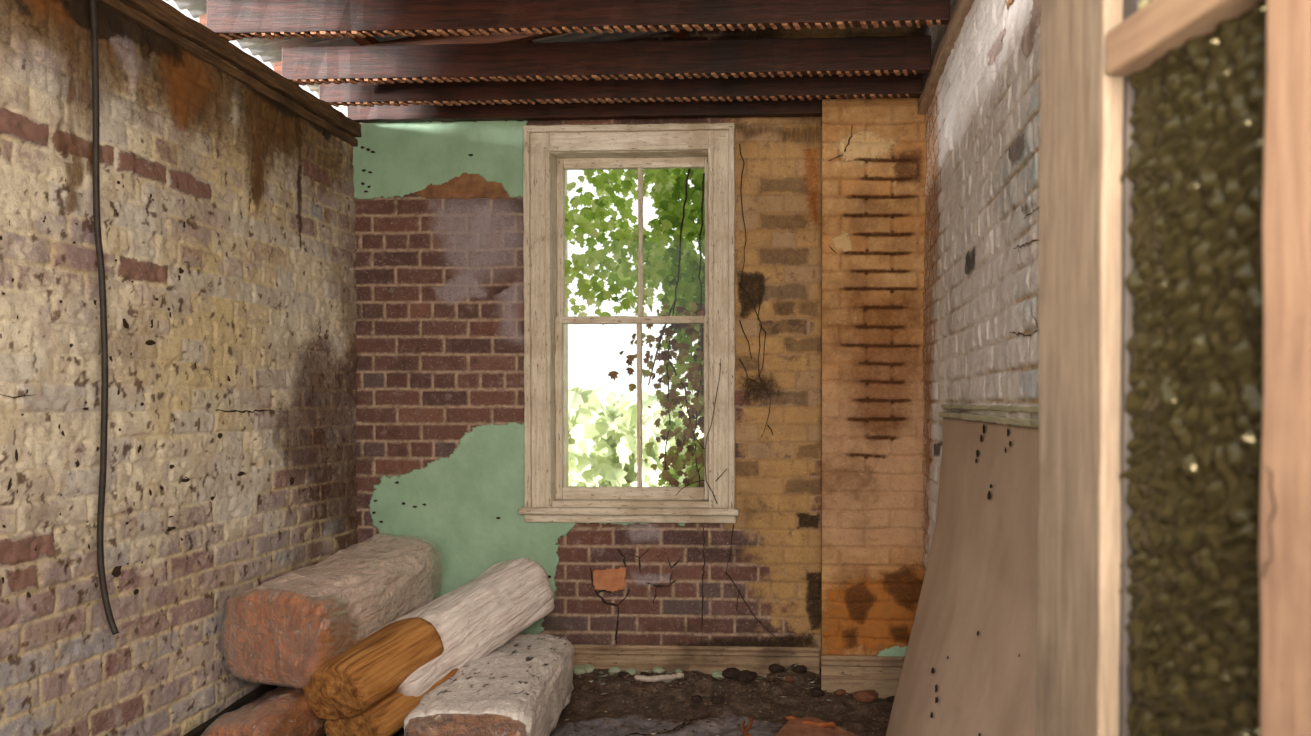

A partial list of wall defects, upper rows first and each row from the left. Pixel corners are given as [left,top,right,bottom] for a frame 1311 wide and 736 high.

leakage [10,0,230,118]
peeling [988,29,1005,65]
peeling [1021,0,1040,58]
leakage [58,126,93,212]
leakage [245,84,331,205]
flaking render [352,120,528,200]
crack [1013,206,1039,252]
crack [1009,312,1038,337]
flaking render [369,422,648,598]
flaking render [518,615,547,634]
crack [590,523,705,646]